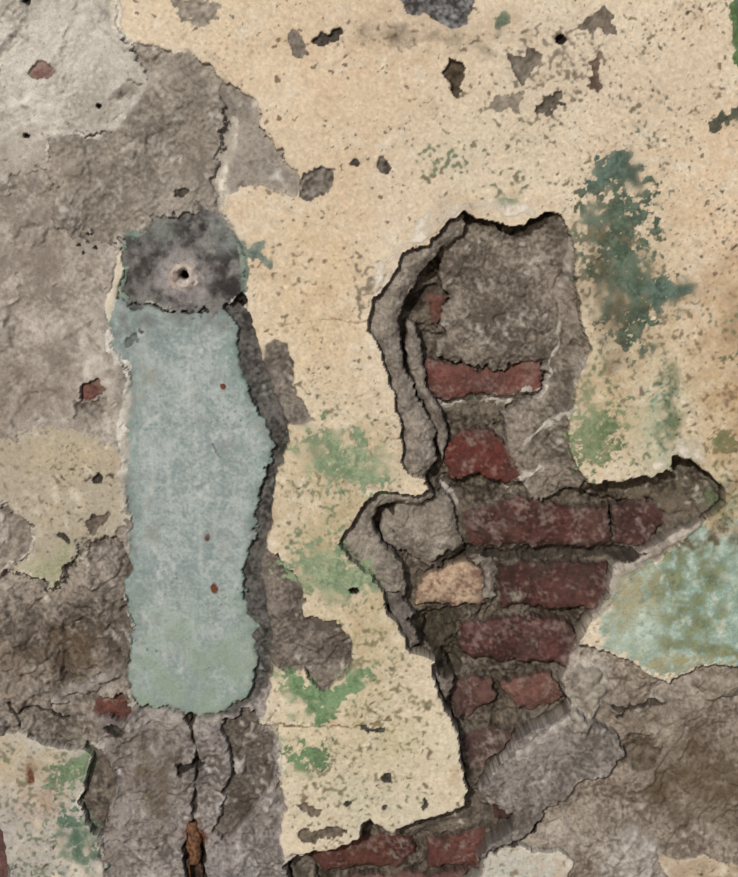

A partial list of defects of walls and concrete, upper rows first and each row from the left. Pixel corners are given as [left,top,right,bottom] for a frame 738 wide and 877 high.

peeling [573,148,699,352]
flaking render [285,211,738,877]
crack [184,712,201,818]
rust [186,820,206,877]